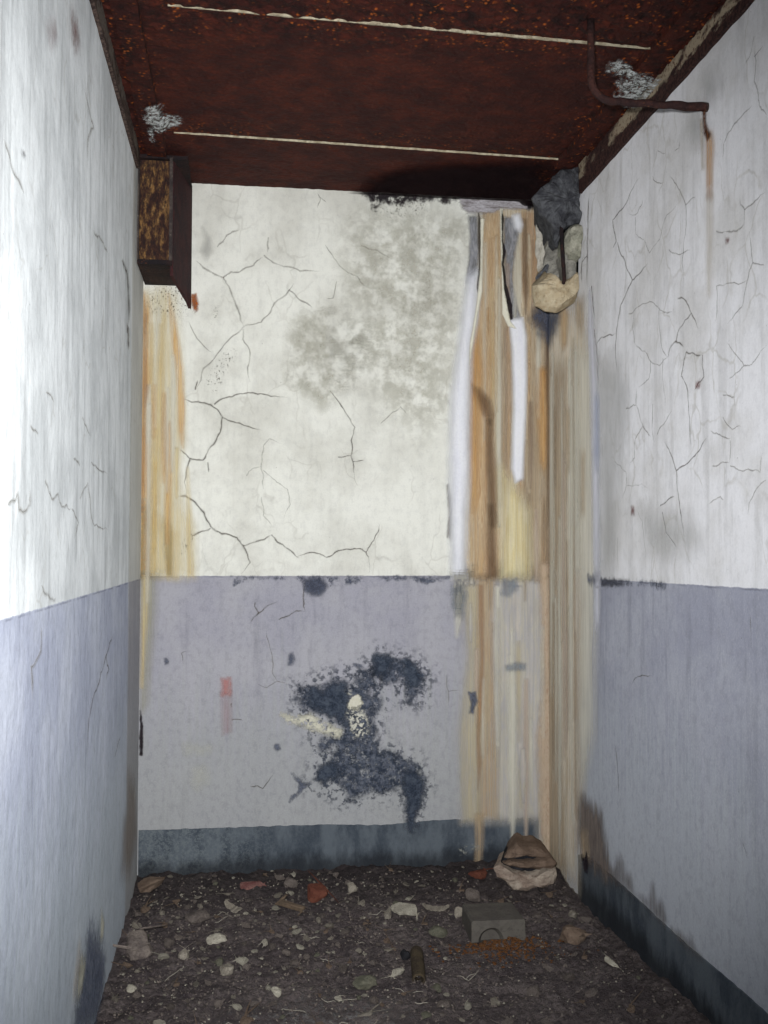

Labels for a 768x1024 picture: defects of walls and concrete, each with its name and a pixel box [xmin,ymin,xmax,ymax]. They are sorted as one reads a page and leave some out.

rust [703,110,712,170]
rust [140,293,190,576]
crack [175,245,309,471]
crack [186,496,379,565]
rust [462,205,593,876]
spalling [531,167,583,313]
crack [581,179,757,407]
crack [626,406,755,540]
water stain [281,653,432,832]
water stain [580,797,620,880]